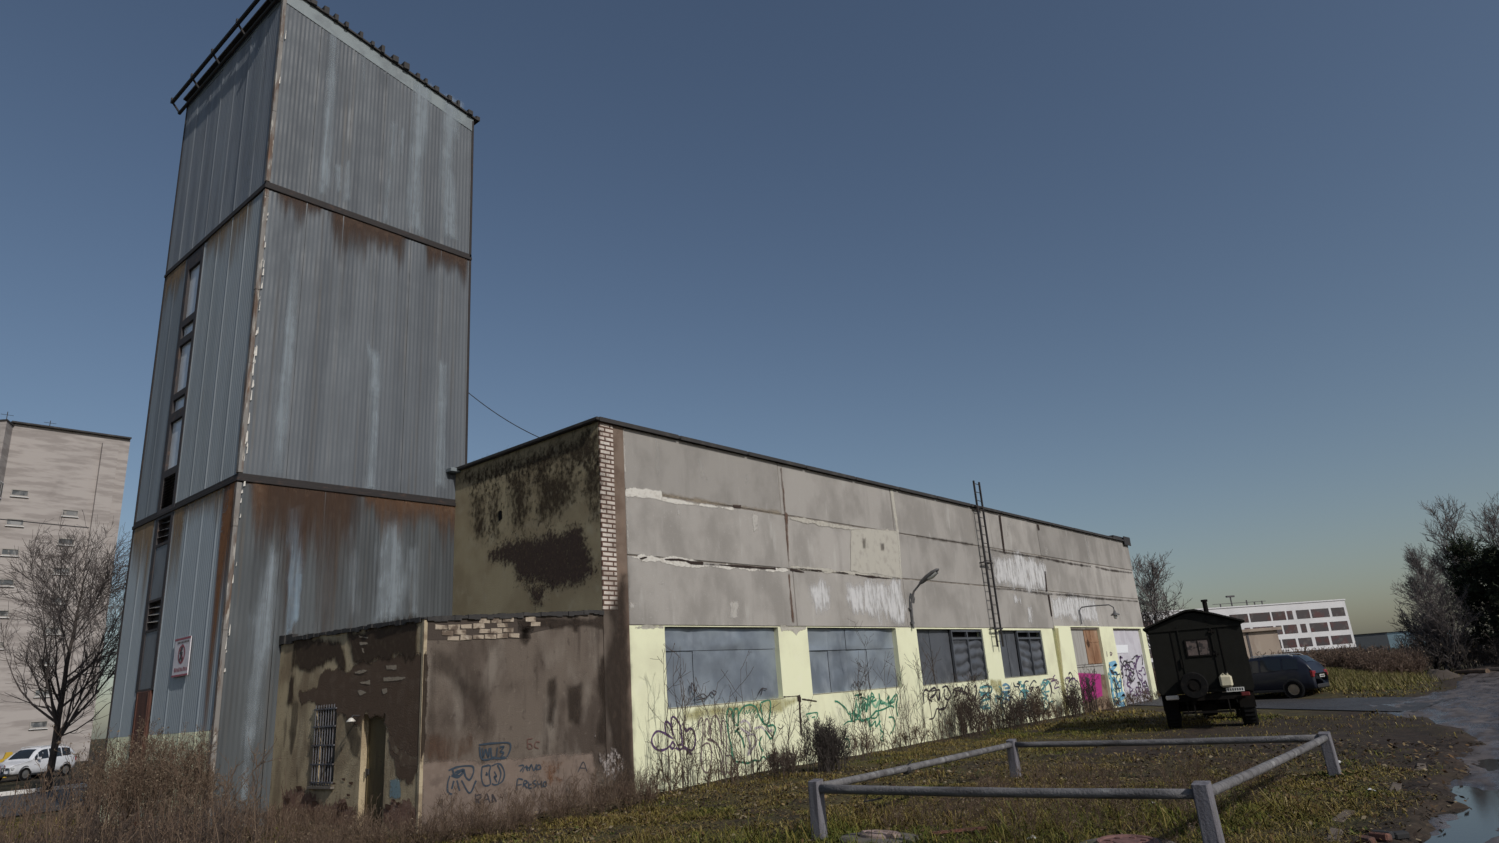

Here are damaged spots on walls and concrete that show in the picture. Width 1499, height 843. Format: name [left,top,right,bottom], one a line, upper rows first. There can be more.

corrosion [280,193,405,258]
corrosion [427,245,467,277]
damp [436,364,603,538]
corrosion [133,520,154,574]
corrosion [170,506,186,562]
corrosion [365,496,455,527]
corrosion [205,482,236,711]
peeling [298,522,599,835]
spalling [282,778,356,829]